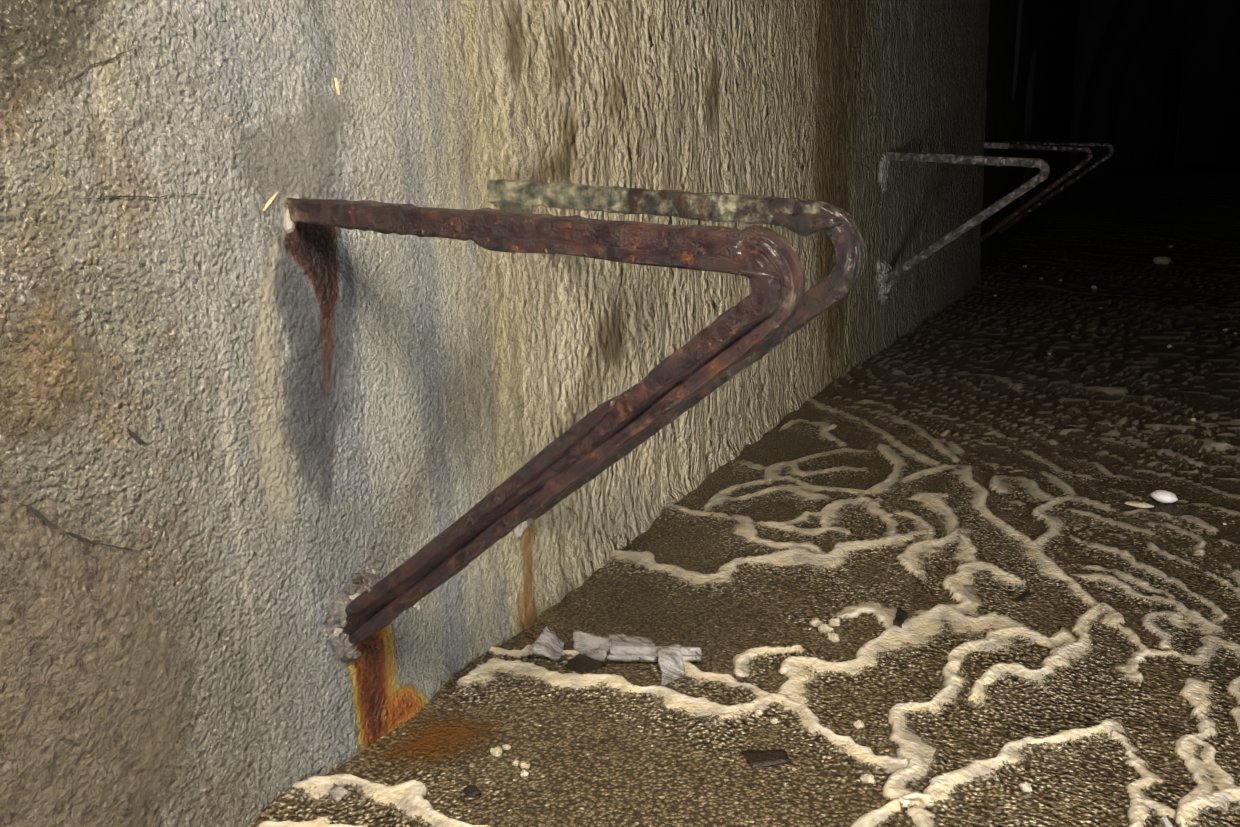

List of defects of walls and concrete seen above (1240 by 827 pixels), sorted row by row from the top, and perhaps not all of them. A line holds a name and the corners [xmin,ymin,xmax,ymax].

rust [285,222,341,394]
rust [473,236,782,279]
rust [775,213,841,237]
rust [345,396,620,631]
rust [347,624,430,752]